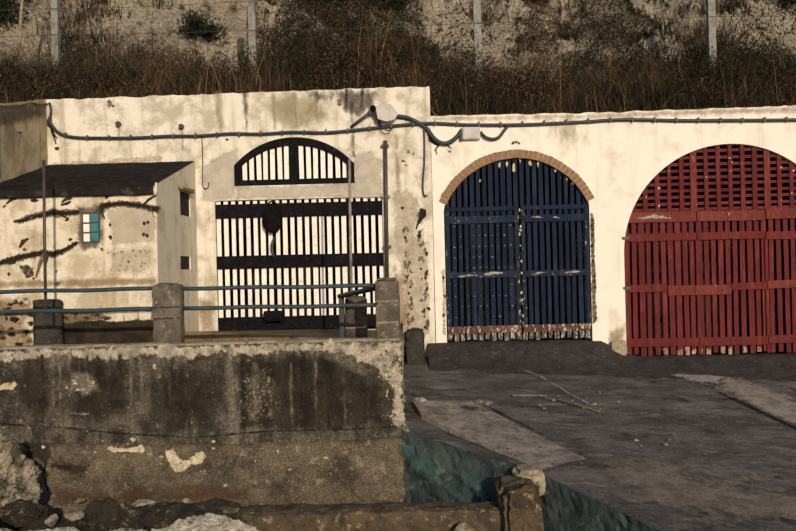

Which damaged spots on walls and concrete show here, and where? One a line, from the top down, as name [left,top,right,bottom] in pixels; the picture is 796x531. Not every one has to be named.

flaking render [19,265,35,279]
flaking render [100,208,154,272]
flaking render [393,188,430,389]
spalling [0,381,18,391]
water stain [0,313,410,431]
spalling [102,437,216,474]